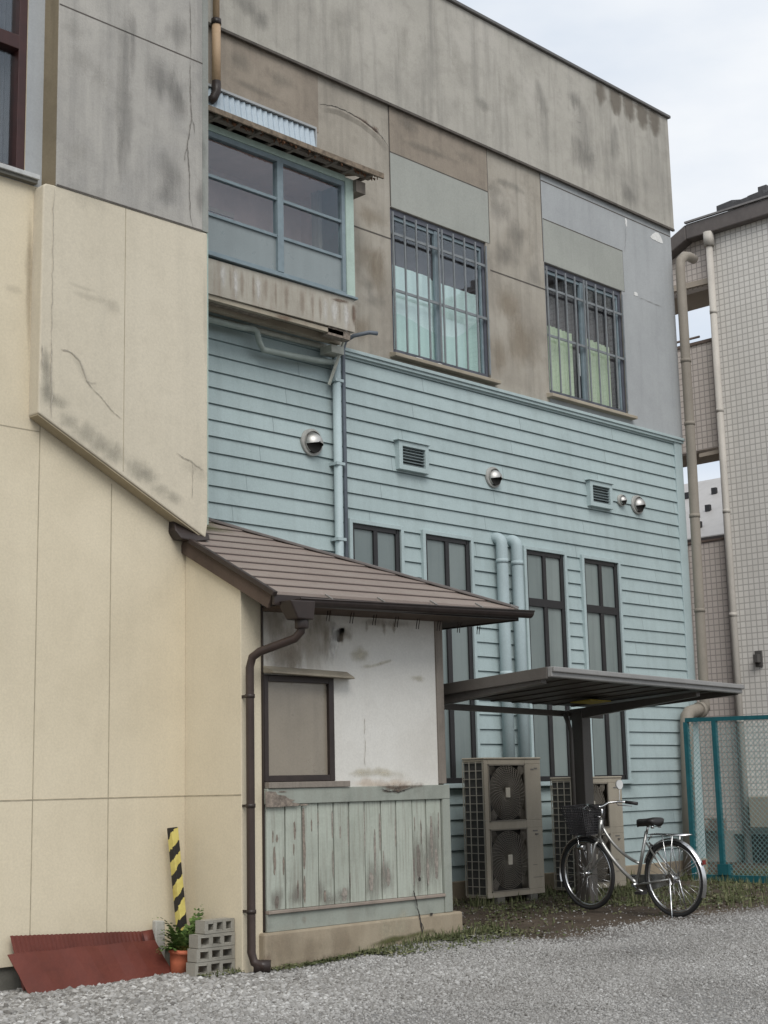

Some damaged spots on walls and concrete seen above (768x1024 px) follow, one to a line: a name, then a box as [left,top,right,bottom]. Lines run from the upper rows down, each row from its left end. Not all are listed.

crack [185,78,195,225]
crack [320,104,388,146]
damp [597,85,659,133]
crack [42,191,118,417]
peeling [272,808,319,902]
peeling [364,812,396,891]
peeling [413,816,422,886]
crack [413,890,424,933]